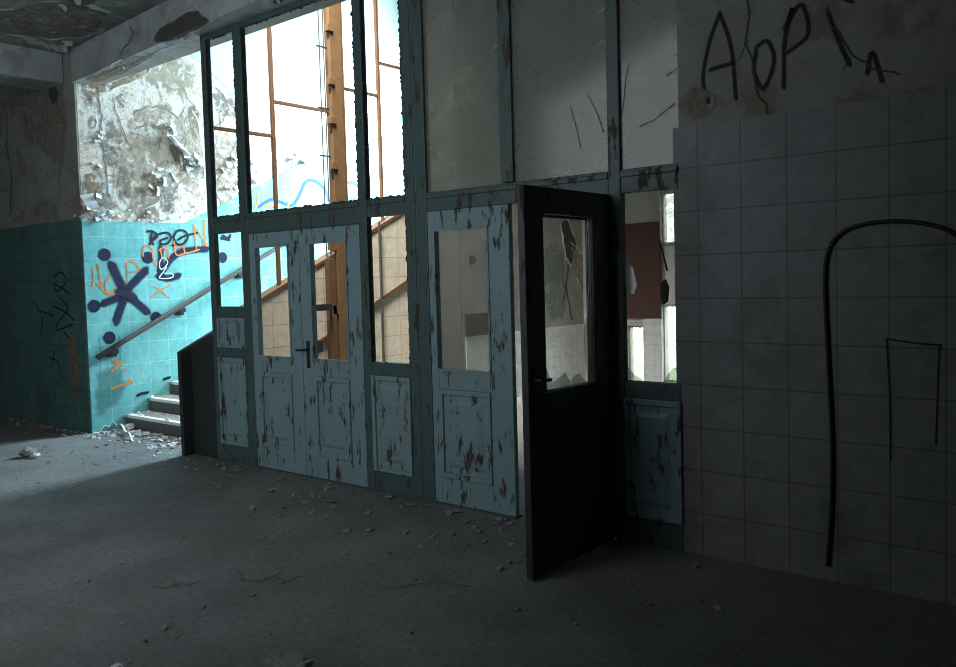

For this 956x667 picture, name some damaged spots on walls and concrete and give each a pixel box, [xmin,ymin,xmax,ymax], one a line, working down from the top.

spalling [77,9,214,144]
spalling [74,104,239,223]